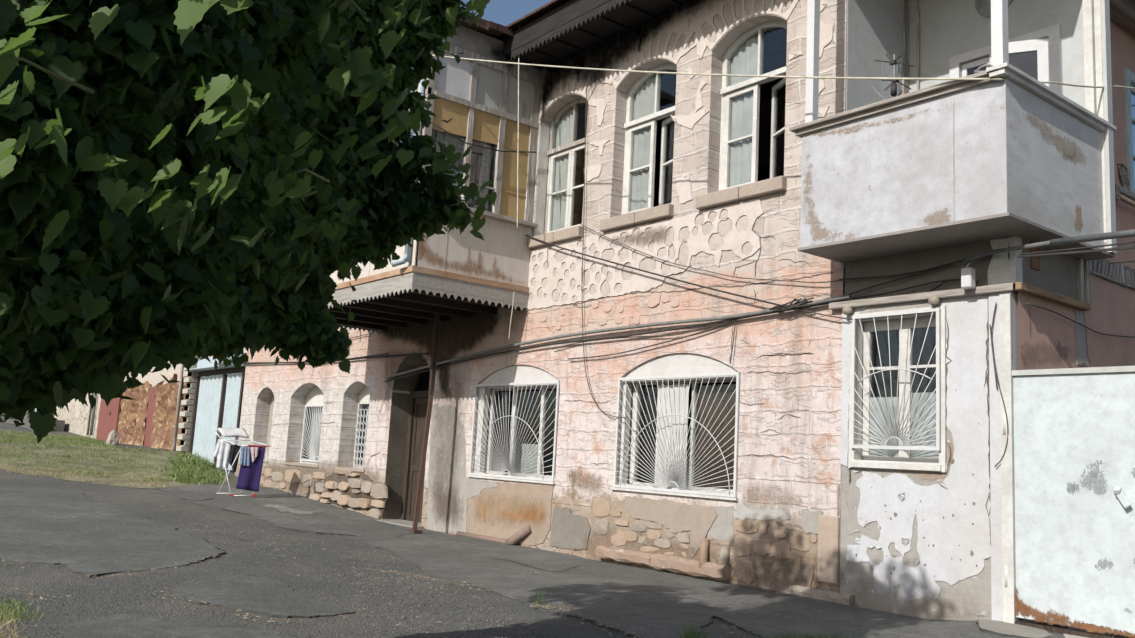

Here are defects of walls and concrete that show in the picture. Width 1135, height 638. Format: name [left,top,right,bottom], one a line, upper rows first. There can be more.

peeling [1026,113,1085,162]
peeling [804,155,854,243]
damp [436,495,456,515]
peeling [846,485,992,617]
rust [1015,588,1135,638]